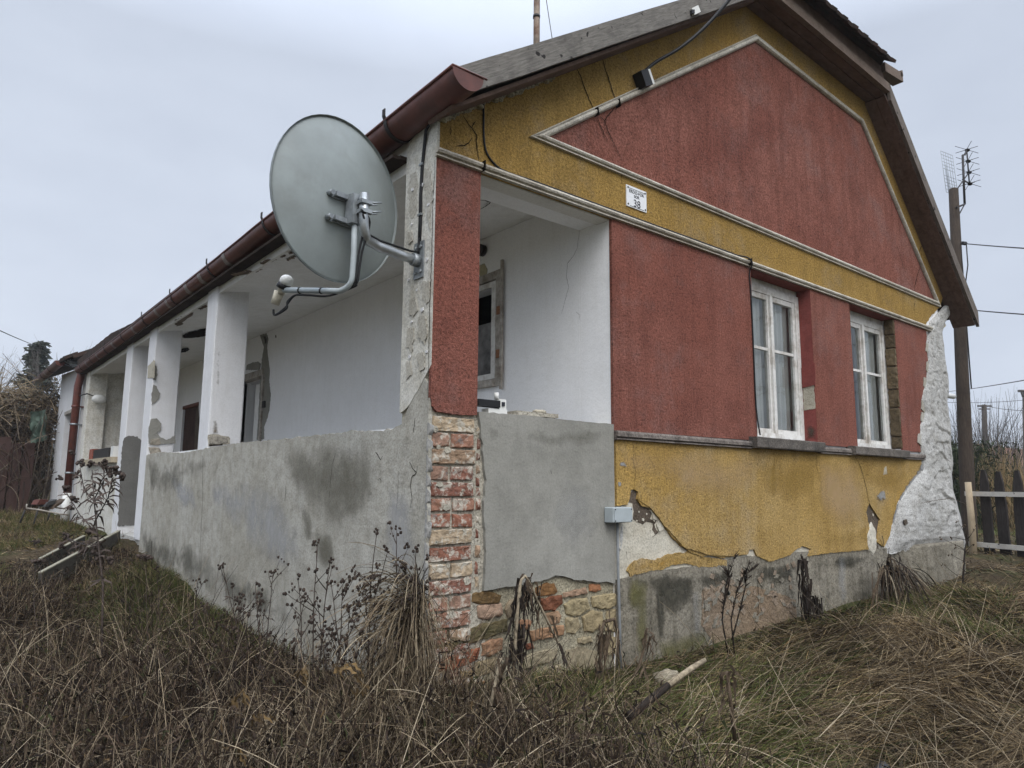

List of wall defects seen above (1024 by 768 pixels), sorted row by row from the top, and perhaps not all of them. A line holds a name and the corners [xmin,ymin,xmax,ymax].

crack [450,117,486,173]
crack [577,61,622,182]
spalling [147,360,160,404]
spalling [246,333,271,440]
flaking render [883,319,903,449]
spalling [148,418,176,454]
spalling [866,505,880,555]
peeling [615,491,809,644]
leakage [656,577,691,636]